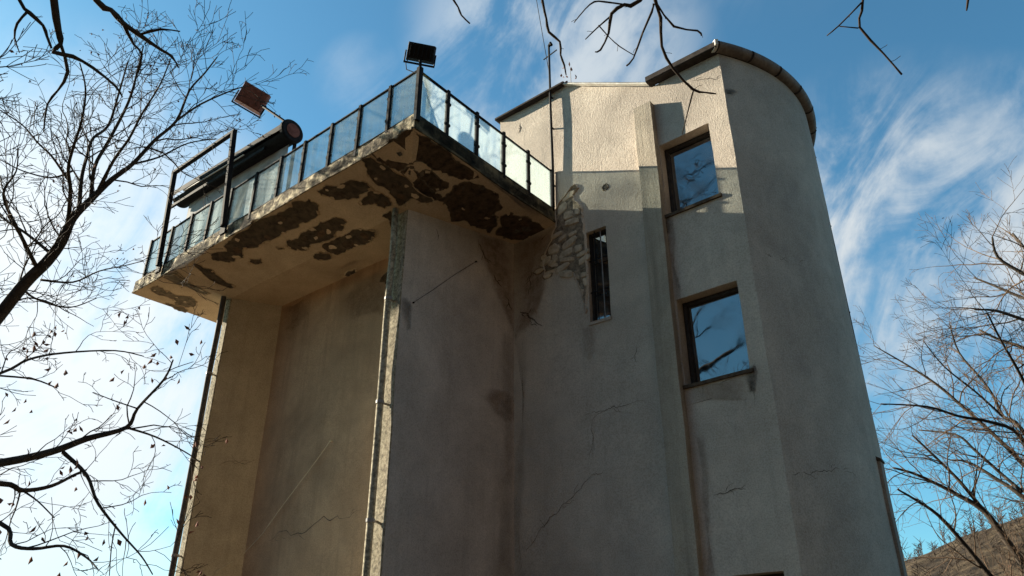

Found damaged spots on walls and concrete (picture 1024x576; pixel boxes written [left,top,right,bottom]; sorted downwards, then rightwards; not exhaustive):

flaking render [150,129,590,313]